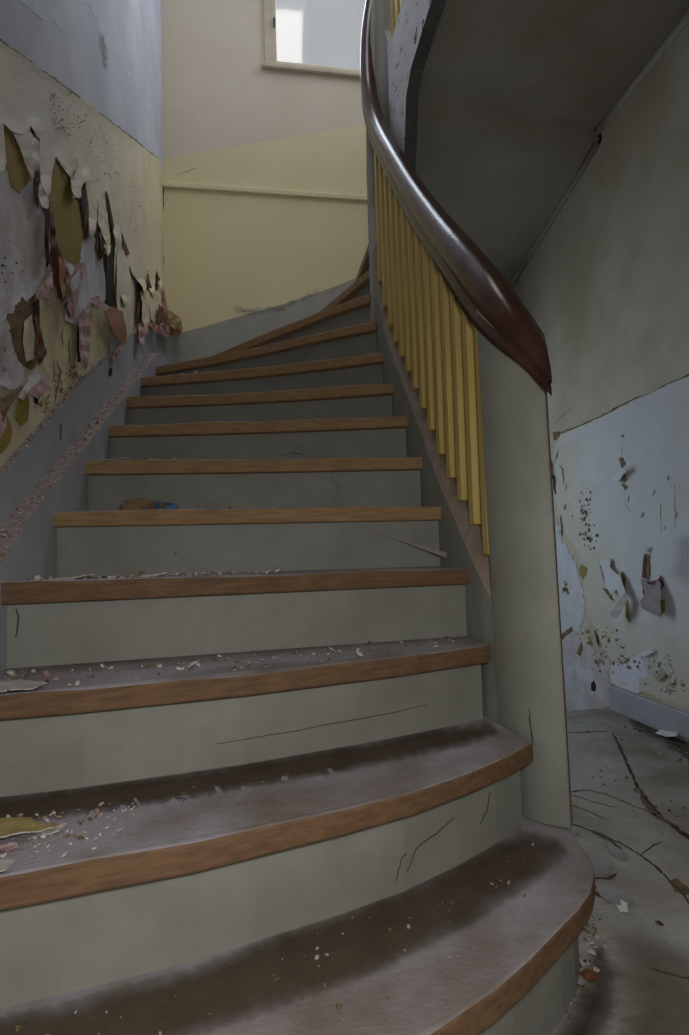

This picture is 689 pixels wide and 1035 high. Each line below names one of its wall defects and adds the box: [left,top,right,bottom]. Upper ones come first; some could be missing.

peeling [0,41,183,453]
peeling [553,376,689,711]
peeling [0,679,47,692]
crack [396,817,454,879]
crack [567,731,689,904]